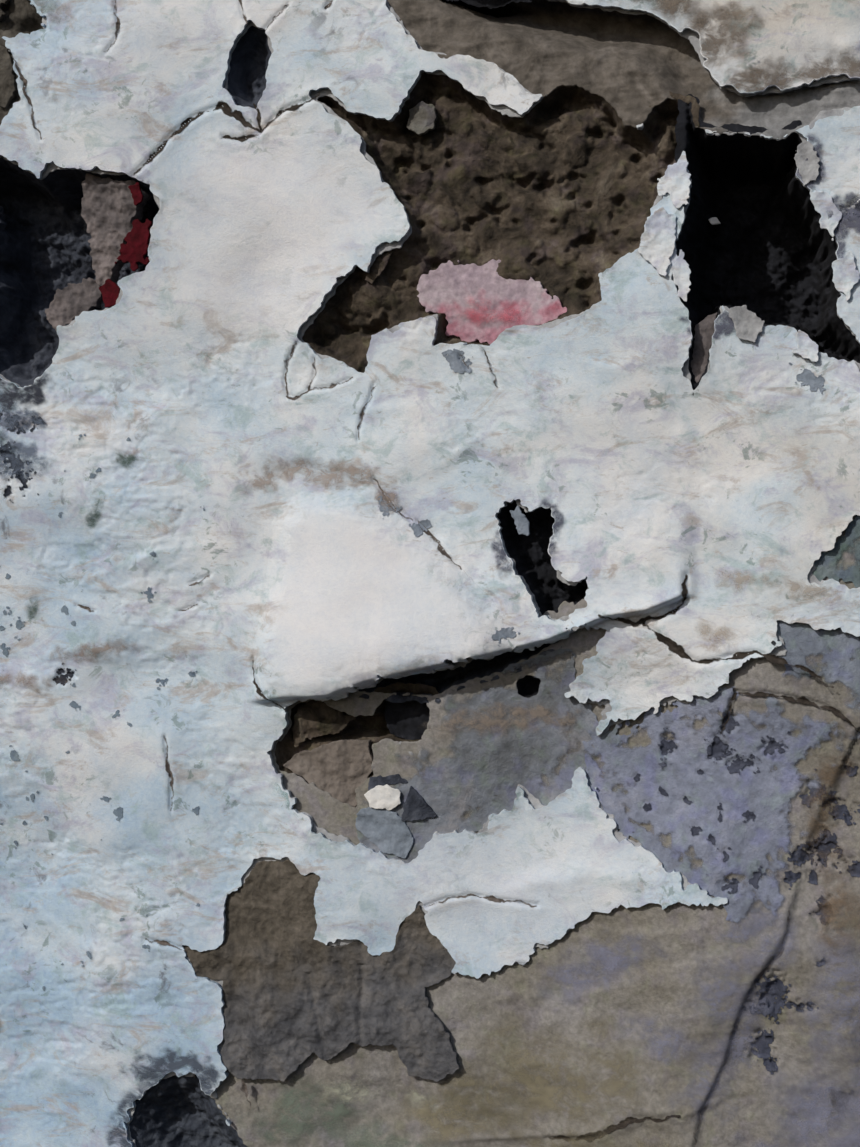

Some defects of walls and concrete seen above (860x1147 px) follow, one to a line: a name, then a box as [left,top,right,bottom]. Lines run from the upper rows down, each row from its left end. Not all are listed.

peeling [0,0,43,125]
crack [11,55,42,139]
crack [107,0,120,51]
crack [134,93,320,174]
spalling [228,26,272,109]
crack [238,0,288,30]
spalling [302,72,700,373]
spalling [497,500,588,619]
peeling [812,515,860,589]
crack [429,893,536,908]
peeling [184,620,860,1147]
crack [549,912,790,1145]